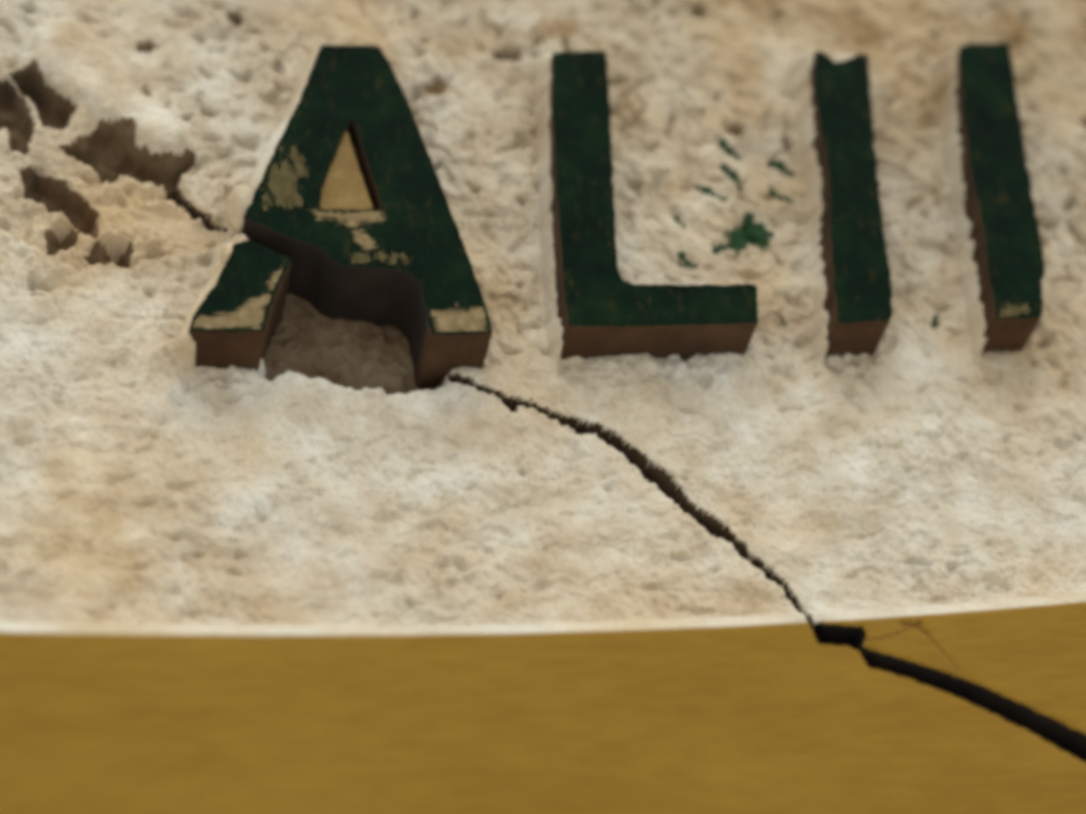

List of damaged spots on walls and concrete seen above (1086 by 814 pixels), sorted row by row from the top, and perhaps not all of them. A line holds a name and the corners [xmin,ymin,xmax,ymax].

spalling [0,56,227,271]
crack [166,186,228,233]
spalling [193,146,488,395]
spalling [423,75,450,95]
crack [447,371,1086,762]